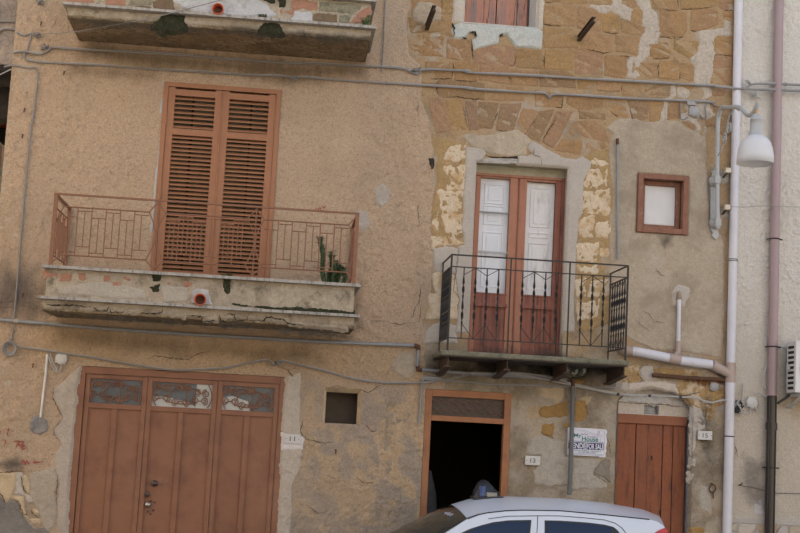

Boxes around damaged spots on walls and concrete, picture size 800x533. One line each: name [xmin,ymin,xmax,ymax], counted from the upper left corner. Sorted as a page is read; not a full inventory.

leakage [73,20,202,32]
leakage [216,28,365,42]
flaking render [280,0,337,23]
flaking render [408,0,734,332]
flaking render [538,387,591,439]
flaking render [619,364,642,383]
flaking render [653,368,725,421]
peeling [0,365,82,533]